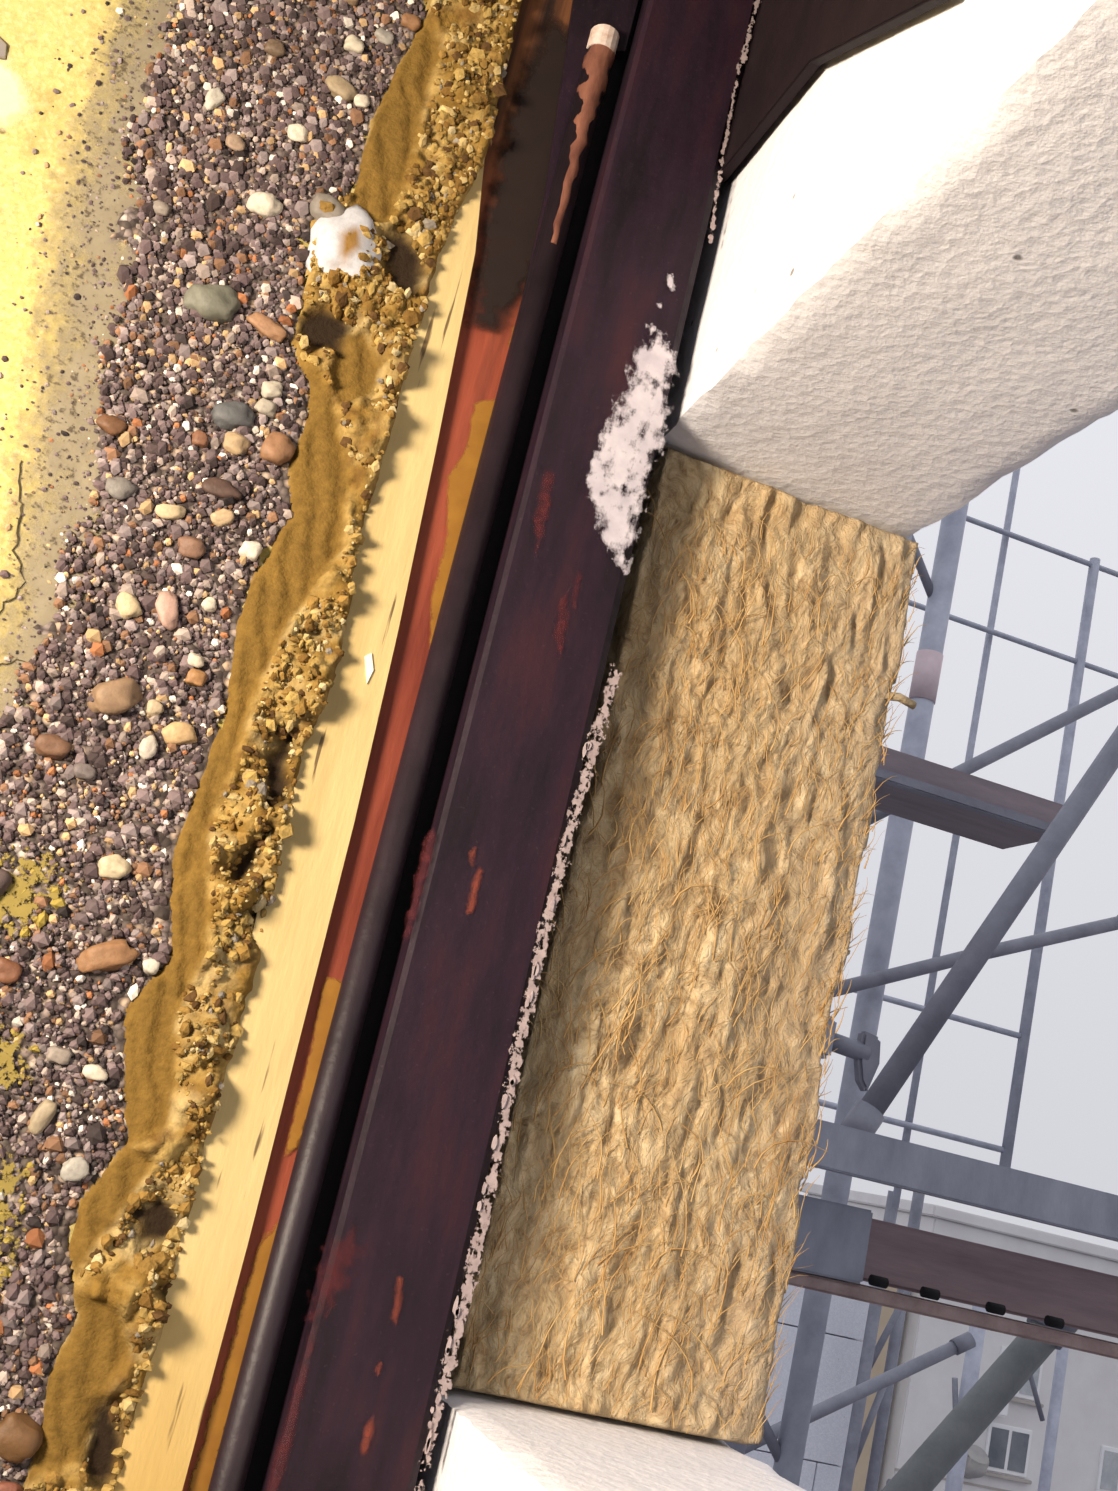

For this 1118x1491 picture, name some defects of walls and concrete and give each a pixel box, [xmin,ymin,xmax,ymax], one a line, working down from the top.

flaking render [0,0,522,1491]
rust [551,24,619,245]